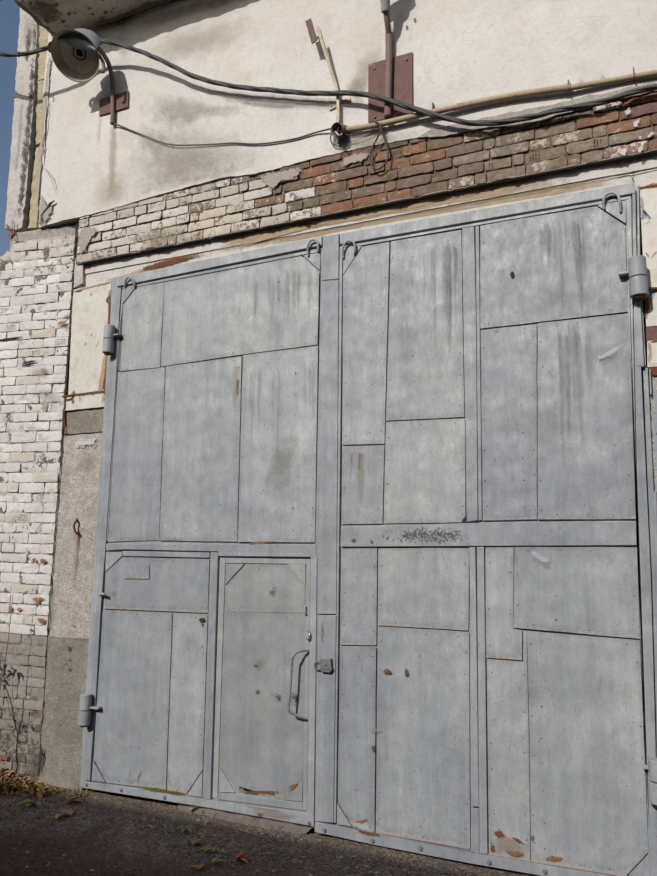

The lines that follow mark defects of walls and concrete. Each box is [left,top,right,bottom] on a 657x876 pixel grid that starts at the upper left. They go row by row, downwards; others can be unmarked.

spalling [36,54,55,226]
peeling [342,153,369,166]
corrosion [239,786,277,795]
corrosion [490,830,534,856]